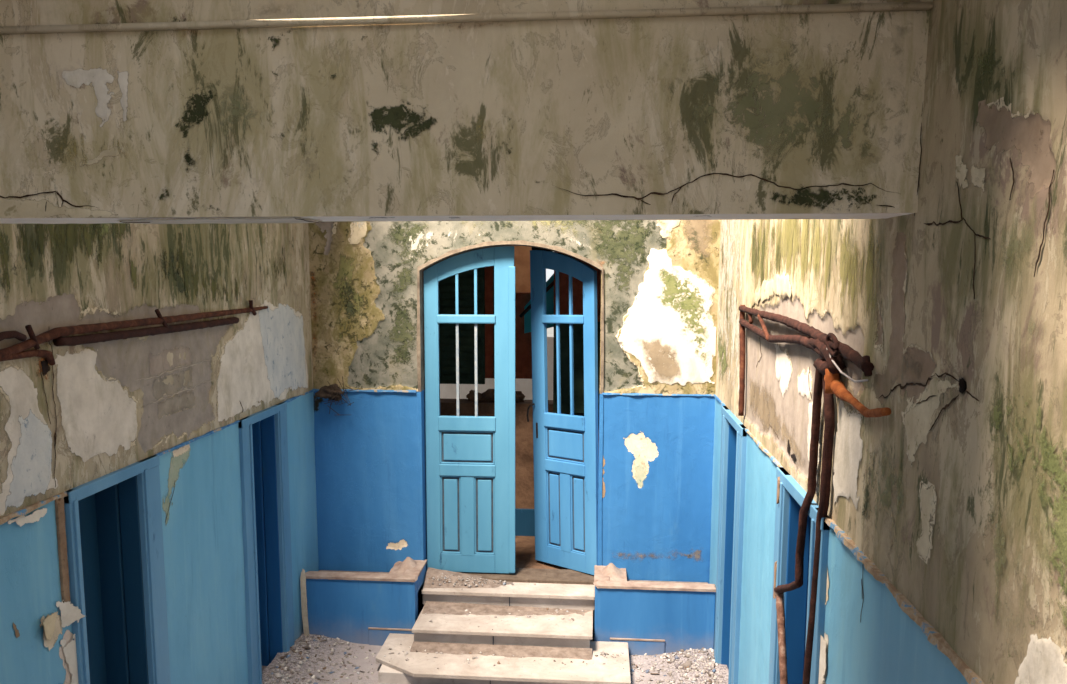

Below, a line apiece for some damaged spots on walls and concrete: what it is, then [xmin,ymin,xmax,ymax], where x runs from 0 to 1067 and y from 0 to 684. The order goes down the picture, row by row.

crack [1,191,97,211]
flaking render [0,196,337,255]
crack [560,106,990,299]
rust [0,300,268,379]
flaking render [347,217,716,391]
rust [738,305,891,418]
flaking render [0,273,317,684]
peeling [623,431,659,488]
peeling [386,539,407,550]
flaking render [1015,634,1067,684]